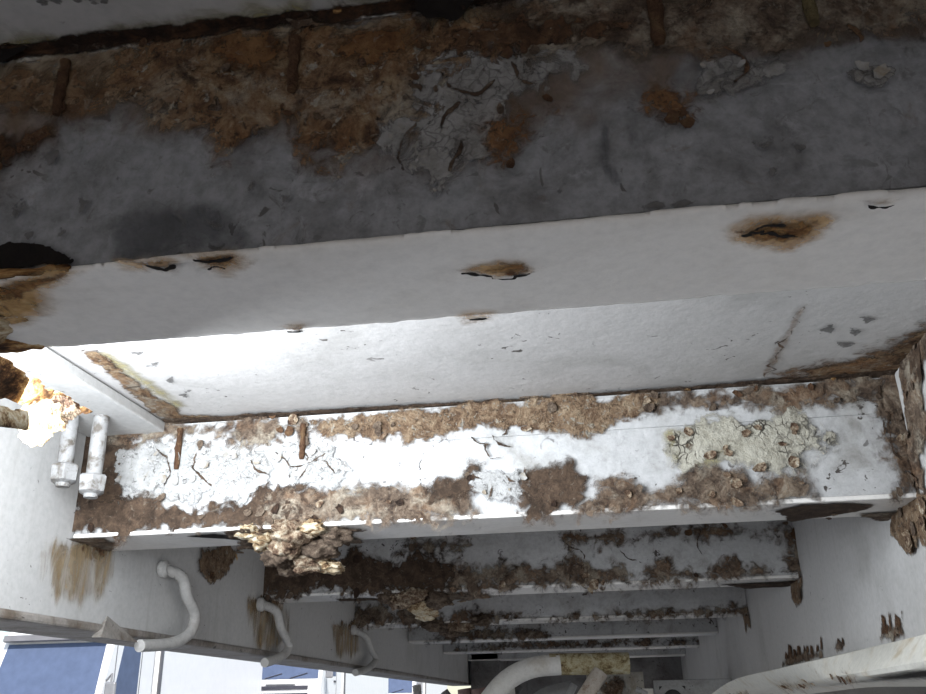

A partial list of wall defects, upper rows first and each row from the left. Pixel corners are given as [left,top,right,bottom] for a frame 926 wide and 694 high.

peeling [695,55,787,96]
peeling [376,49,590,193]
rust [734,216,833,251]
rust [119,259,176,272]
rust [193,255,238,270]
rust [461,262,531,280]
peeling [896,350,926,497]
peeling [114,414,352,524]
peeling [465,469,527,503]
peeling [663,403,837,507]
spalling [776,503,898,540]
spalling [726,580,798,589]